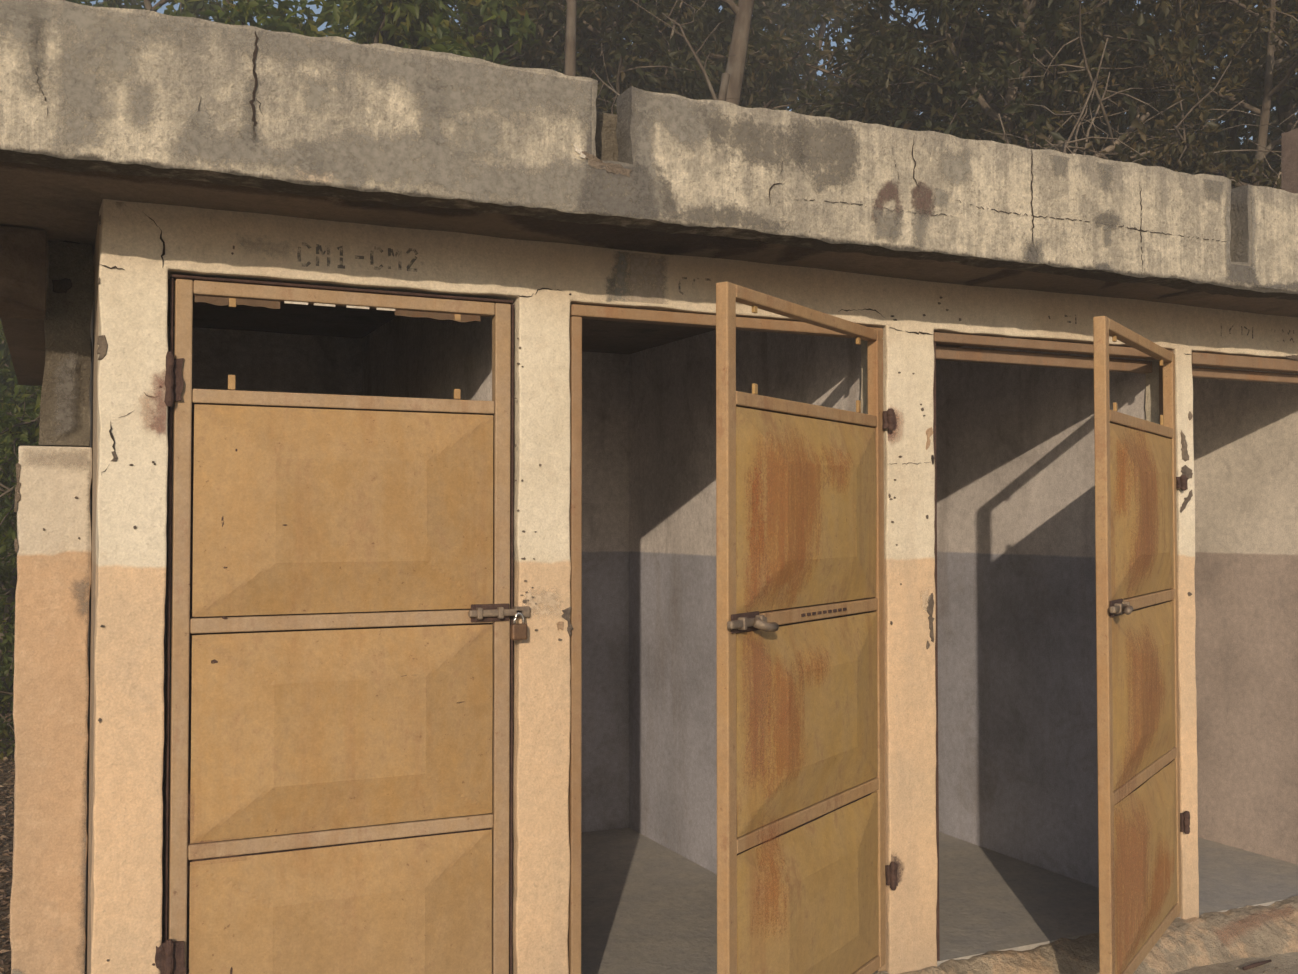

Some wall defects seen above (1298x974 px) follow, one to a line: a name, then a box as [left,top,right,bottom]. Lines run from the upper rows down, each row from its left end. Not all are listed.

water stain [0,0,205,146]
crack [249,31,264,140]
crack [145,214,165,268]
water stain [0,27,860,304]
rust [872,181,950,246]
crack [769,143,1225,265]
water stain [966,240,1045,286]
water stain [1093,211,1120,246]
water stain [1204,179,1298,290]
rust [145,376,166,432]